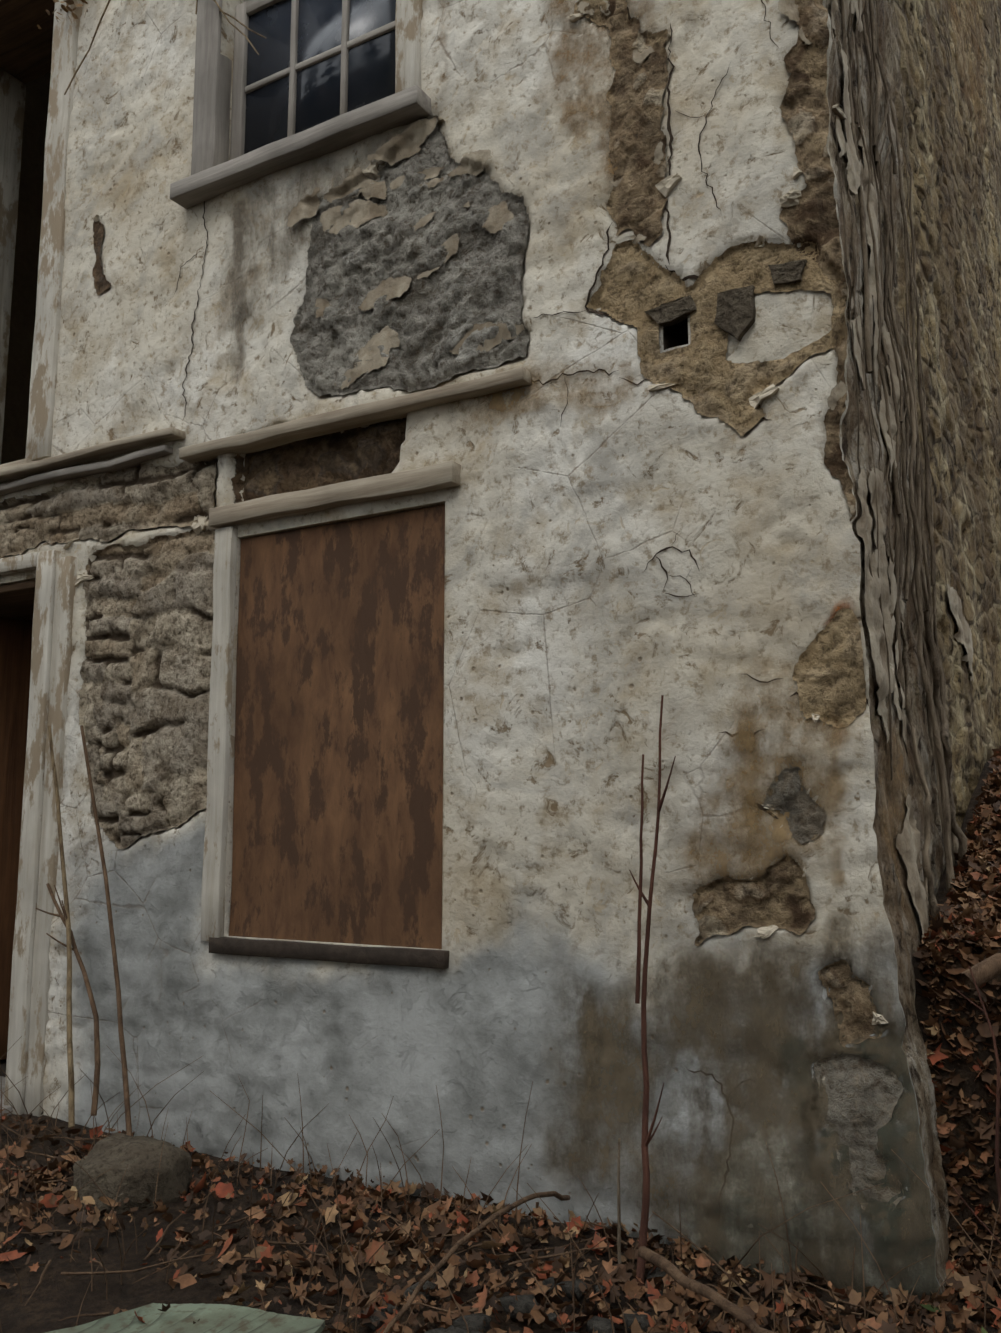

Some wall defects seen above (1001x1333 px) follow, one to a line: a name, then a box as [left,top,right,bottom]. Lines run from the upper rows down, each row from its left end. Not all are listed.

flaking render [287,115,530,396]
crack [664,24,731,281]
flaking render [568,0,908,757]
flaking render [0,418,407,849]
flaking render [947,584,974,682]
flaking render [692,853,815,946]
flaking render [764,767,827,844]
flaking render [895,794,929,939]
flaking render [814,959,904,1223]